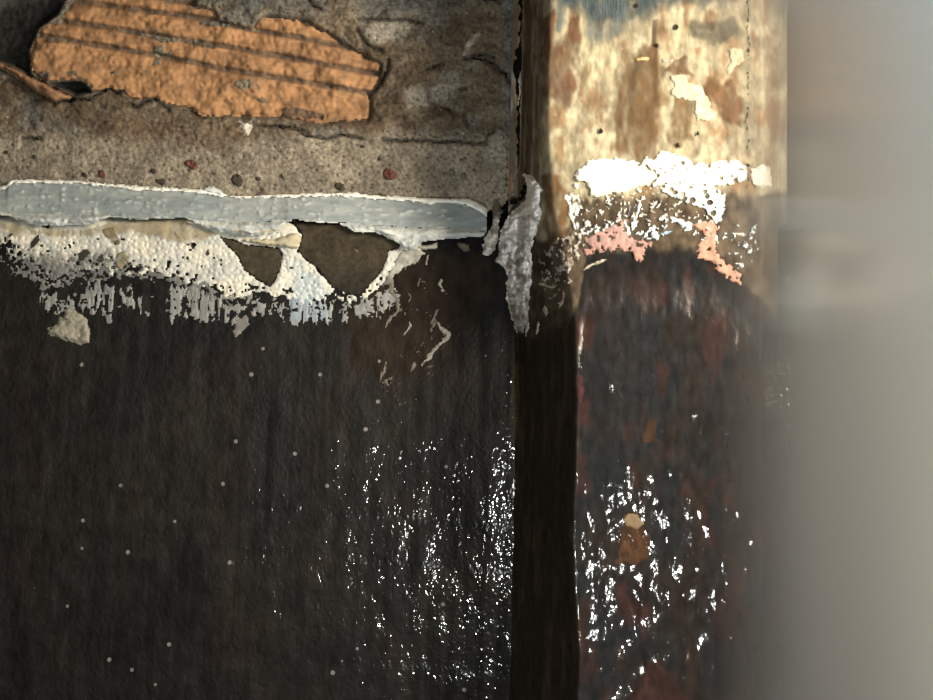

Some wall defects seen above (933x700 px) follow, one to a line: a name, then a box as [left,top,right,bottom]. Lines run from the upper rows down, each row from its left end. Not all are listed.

water stain [557,0,689,38]
water stain [690,18,740,42]
spalling [0,0,513,337]
peeling [575,143,761,285]